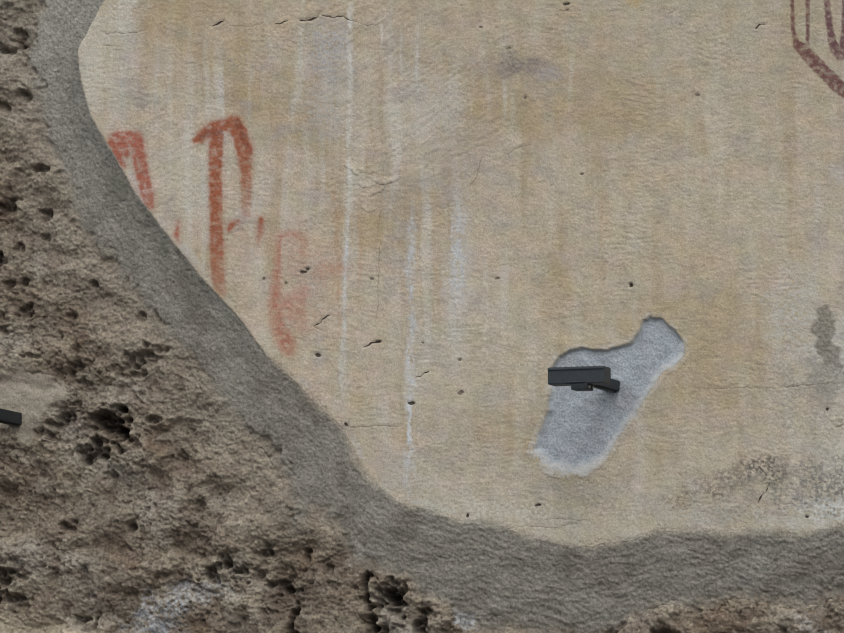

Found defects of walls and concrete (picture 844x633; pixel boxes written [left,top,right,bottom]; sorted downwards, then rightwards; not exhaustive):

crack [213,15,377,27]
flaking render [525,311,690,480]
water stain [636,247,844,531]